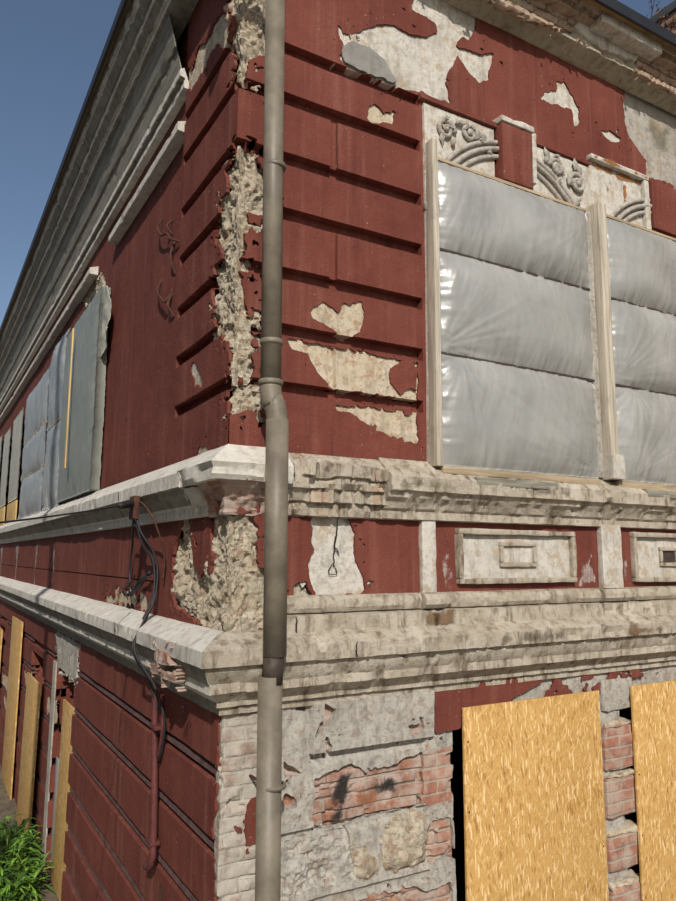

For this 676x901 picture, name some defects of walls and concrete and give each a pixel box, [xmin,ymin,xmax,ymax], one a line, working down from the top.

spalling [188,0,266,93]
peeling [367,105,394,131]
peeling [329,0,492,103]
peeling [541,82,579,126]
peeling [589,12,676,98]
flaking render [595,91,676,190]
spalling [209,146,266,423]
peeling [287,302,422,450]
spalling [171,478,265,632]
peeling [294,517,372,595]
flaking render [150,637,186,692]
flaking render [281,741,453,901]